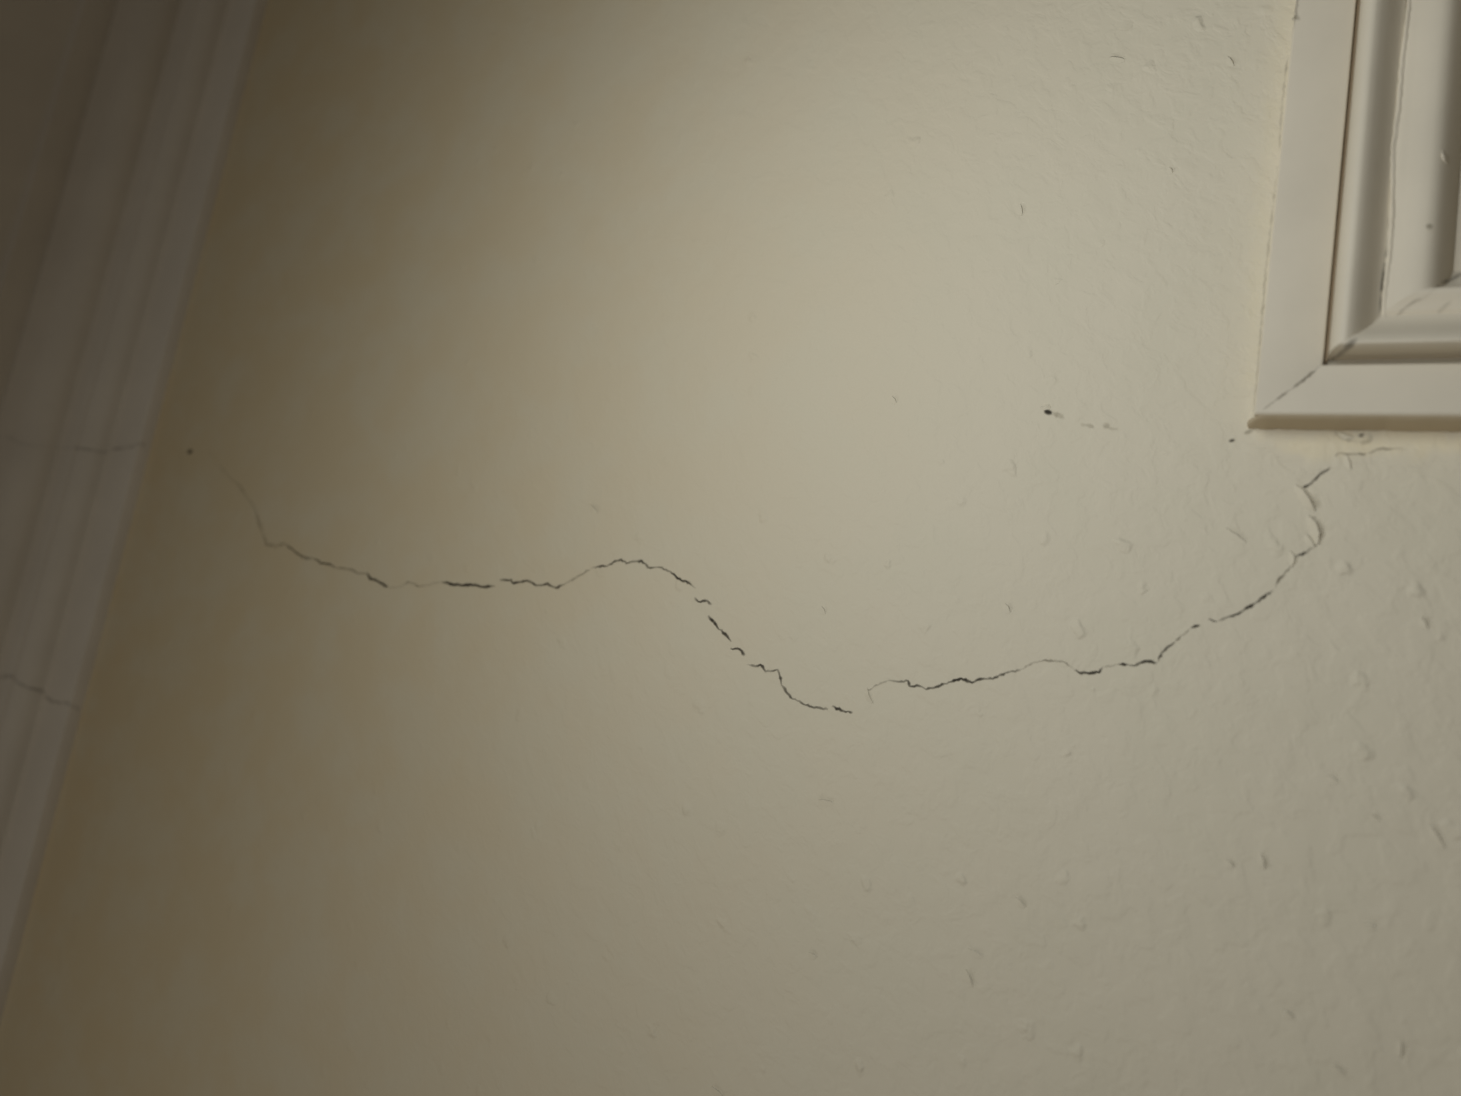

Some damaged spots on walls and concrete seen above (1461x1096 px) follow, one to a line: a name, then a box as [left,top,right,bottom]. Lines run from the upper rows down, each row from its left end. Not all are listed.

crack [444,579,560,588]
crack [600,559,874,713]
crack [908,673,1004,689]
crack [1077,455,1353,674]